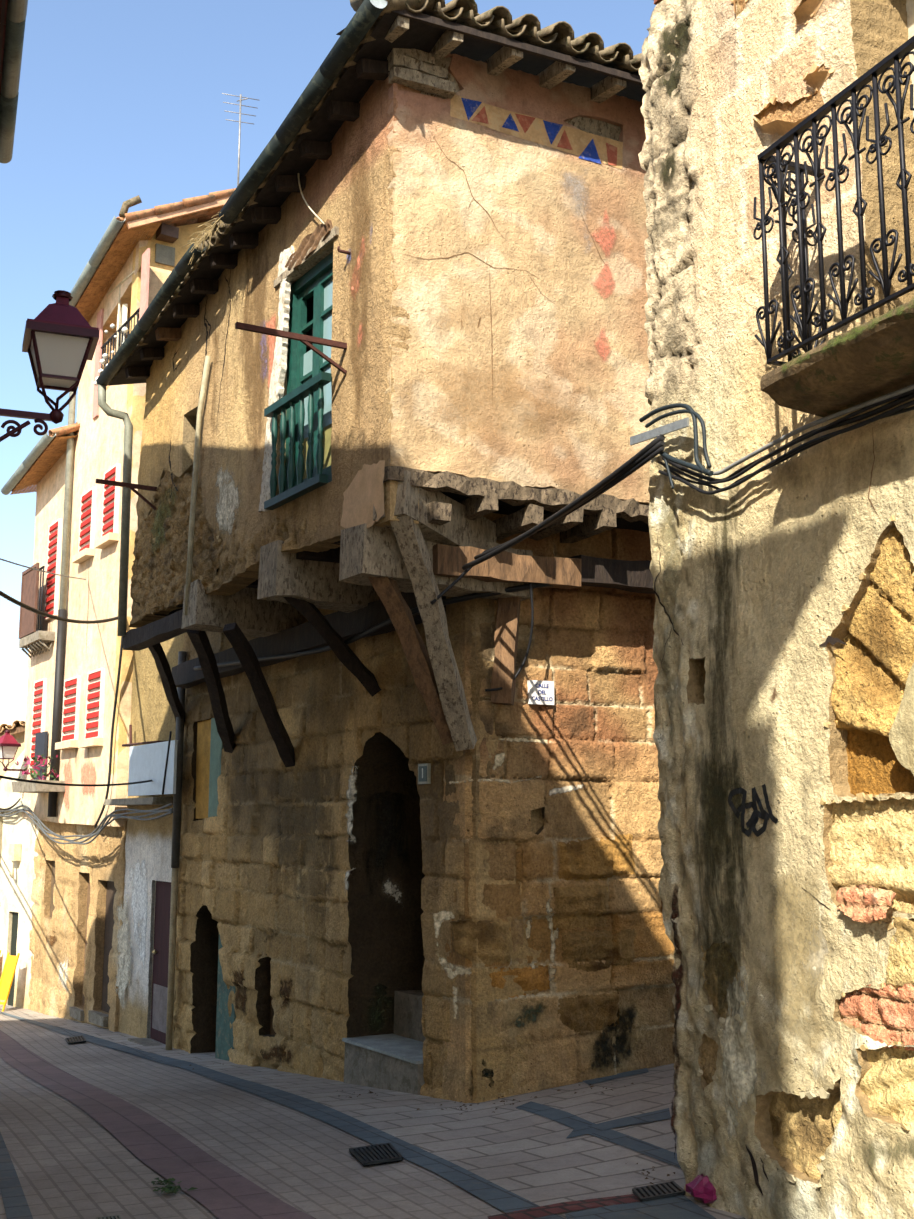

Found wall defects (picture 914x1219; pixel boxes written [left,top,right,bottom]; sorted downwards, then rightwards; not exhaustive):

flaking render [730,0,749,15]
flaking render [794,0,824,26]
flaking render [753,64,835,136]
spalling [130,461,224,616]
damp [696,497,757,1134]
spalling [820,515,914,1130]
spalling [751,1087,843,1187]